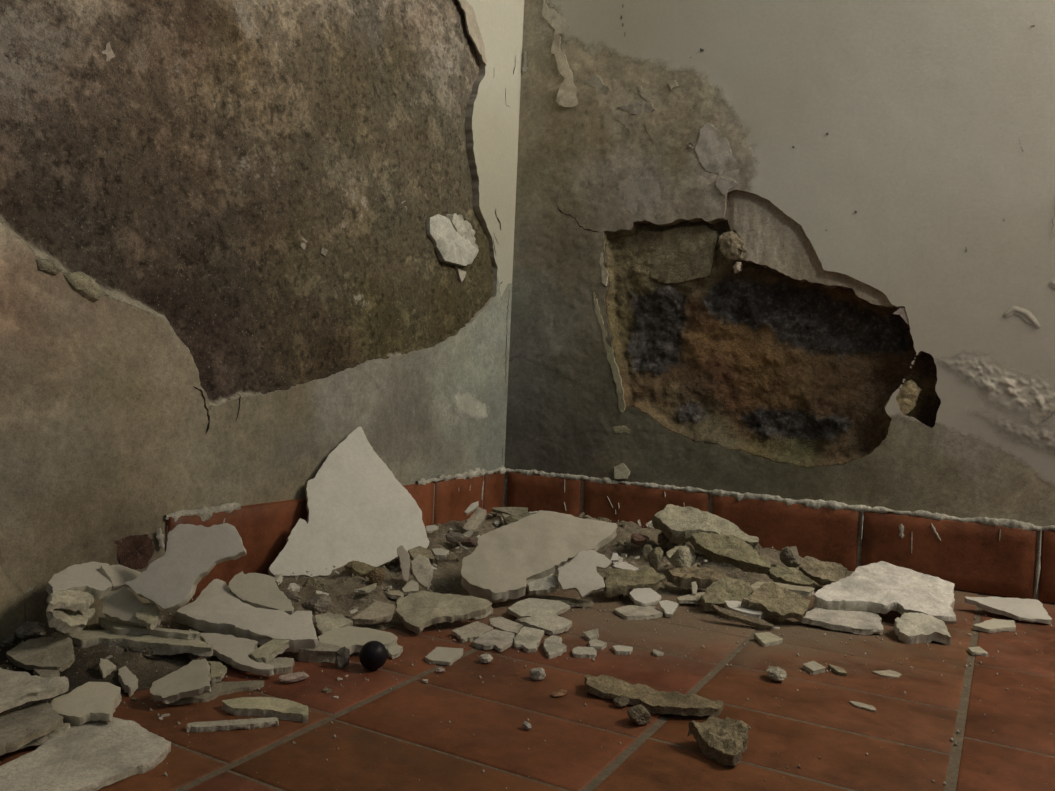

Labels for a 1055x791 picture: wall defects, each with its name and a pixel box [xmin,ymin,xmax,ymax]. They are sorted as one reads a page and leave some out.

spalling [0,0,941,640]
spalling [387,644,403,659]
spalling [425,608,607,680]
spalling [99,658,116,678]
spalling [207,661,227,685]
spalling [279,672,309,683]
spalling [803,661,826,675]